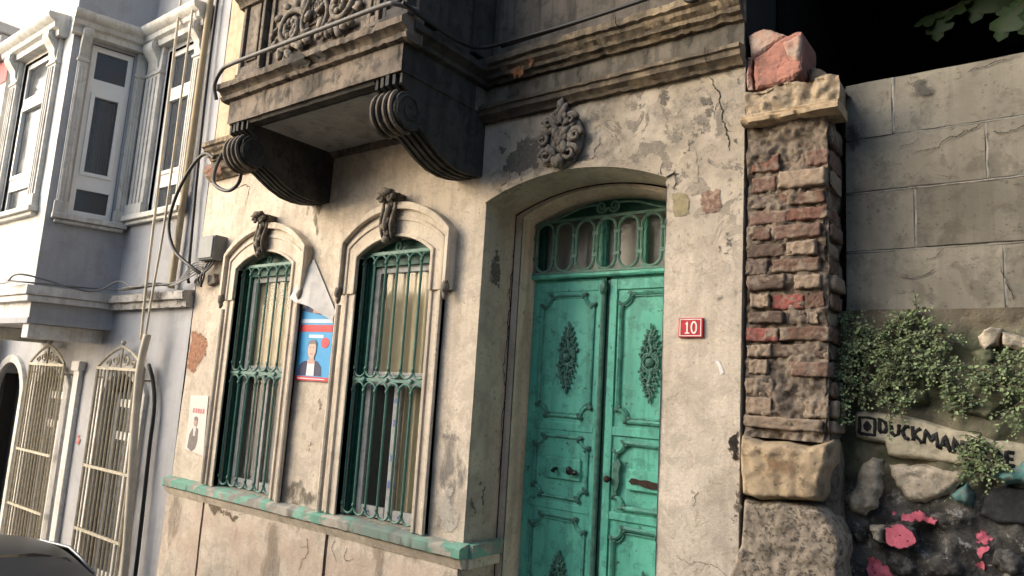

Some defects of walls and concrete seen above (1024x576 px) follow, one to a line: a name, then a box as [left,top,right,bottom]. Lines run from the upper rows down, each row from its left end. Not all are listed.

rust [512,57,533,78]
crack [704,48,733,151]
crack [900,123,1024,154]
peeling [491,137,540,189]
spalling [187,330,208,373]
spalling [208,504,240,522]